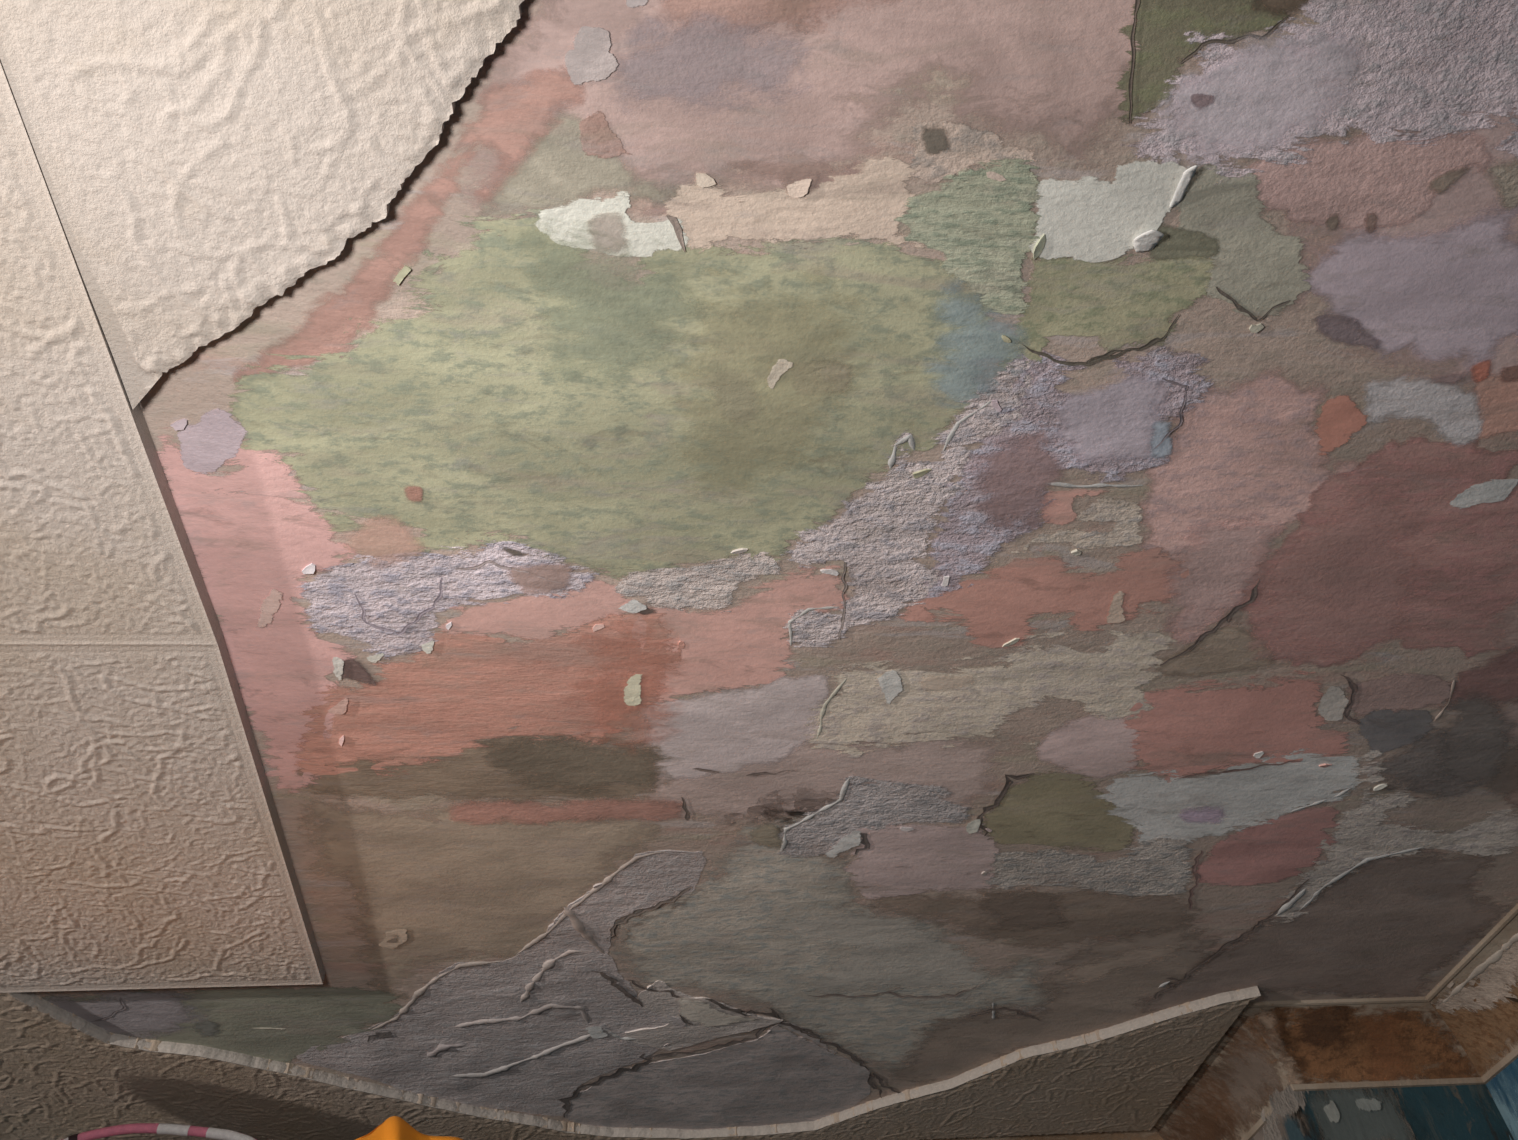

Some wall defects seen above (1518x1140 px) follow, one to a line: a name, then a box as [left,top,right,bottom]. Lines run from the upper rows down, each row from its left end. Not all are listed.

peeling [157,0,1518,793]
crack [629,980,681,998]
peeling [8,565,1518,1140]
crack [741,984,1040,1098]